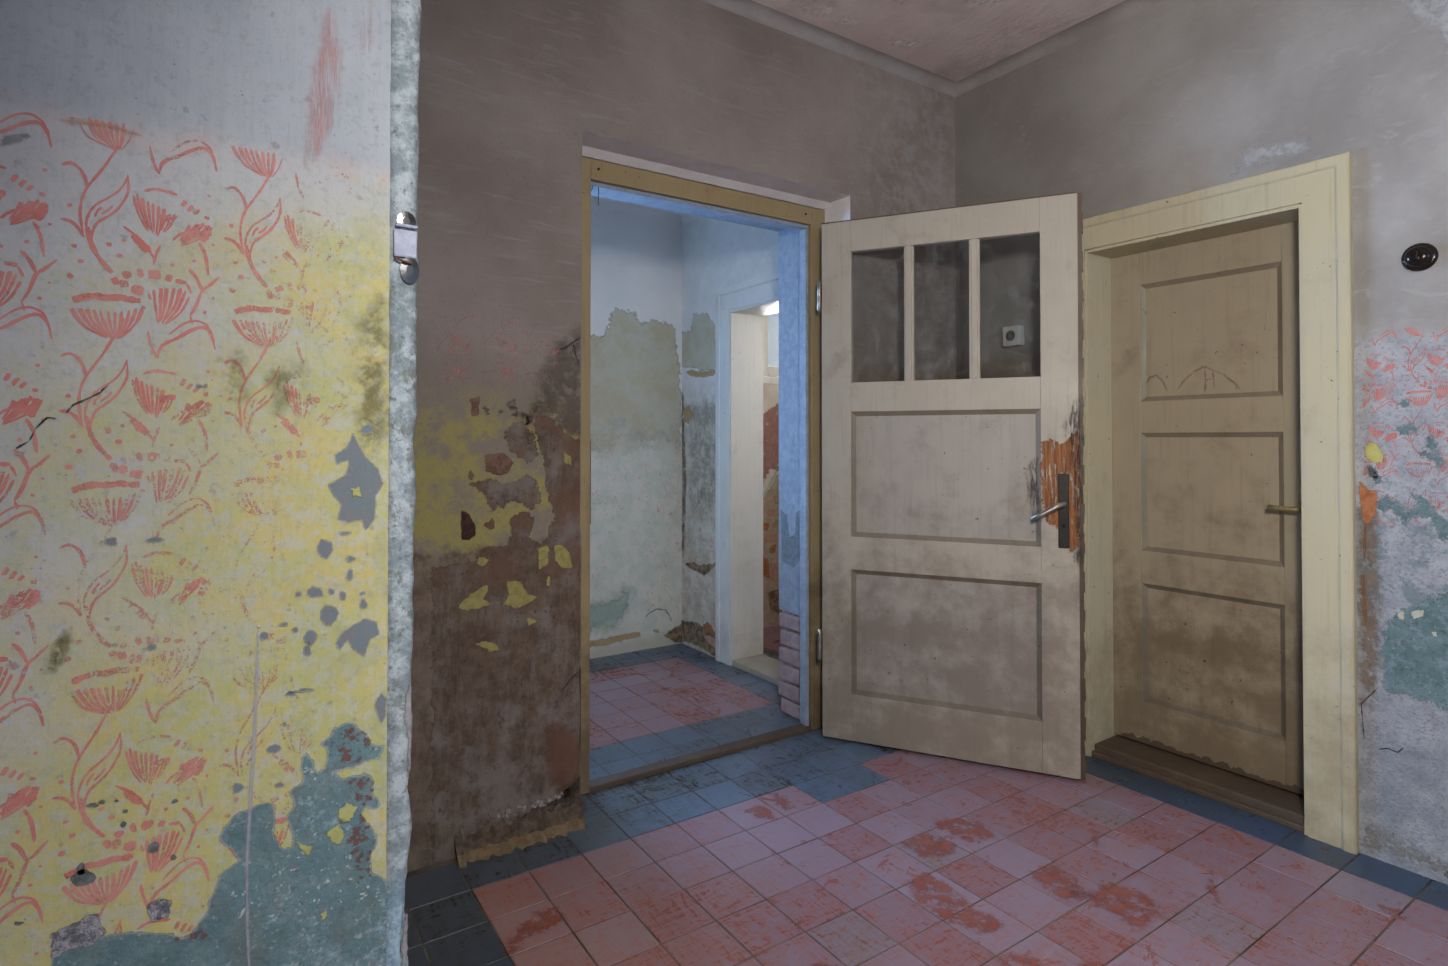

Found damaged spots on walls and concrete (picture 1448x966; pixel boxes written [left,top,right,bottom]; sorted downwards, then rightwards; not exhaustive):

peeling [1396,399,1445,468]
peeling [259,424,384,657]
peeling [428,307,716,862]
peeling [1359,464,1448,558]
peeling [374,693,387,723]
peeling [1378,592,1448,717]
peeling [50,723,409,966]